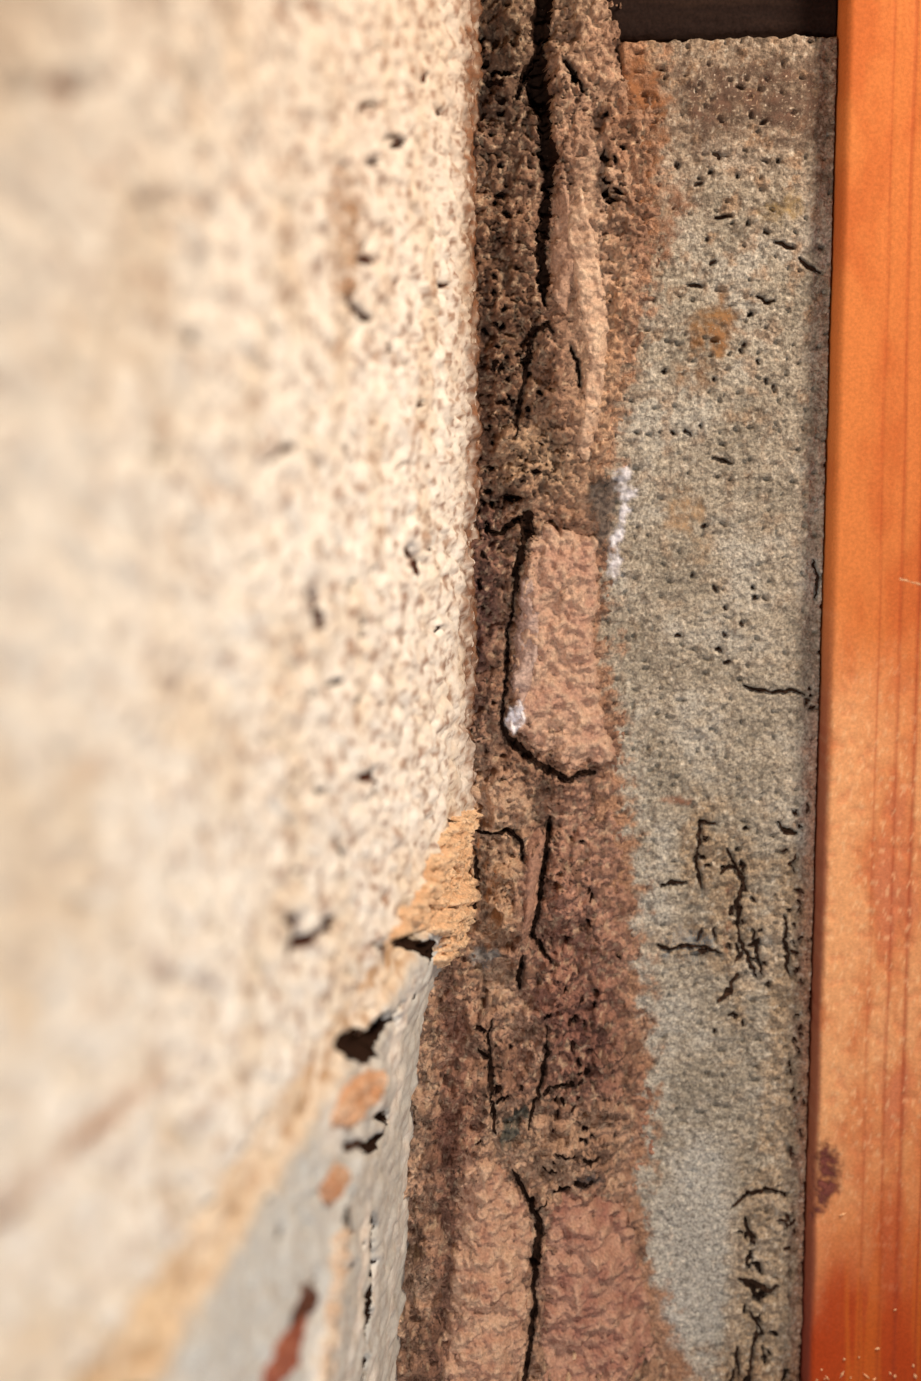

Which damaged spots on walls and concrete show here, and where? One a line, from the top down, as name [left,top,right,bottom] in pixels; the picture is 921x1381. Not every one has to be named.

crack [515,0,583,437]
crack [485,493,596,783]
crack [377,936,436,1000]
crack [473,816,552,989]
crack [657,819,762,1002]
spalling [317,1003,402,1206]
crack [478,1019,551,1135]
peeling [261,1224,365,1381]
crack [512,1169,547,1381]
crack [729,1278,779,1381]
crack [732,1186,783,1244]